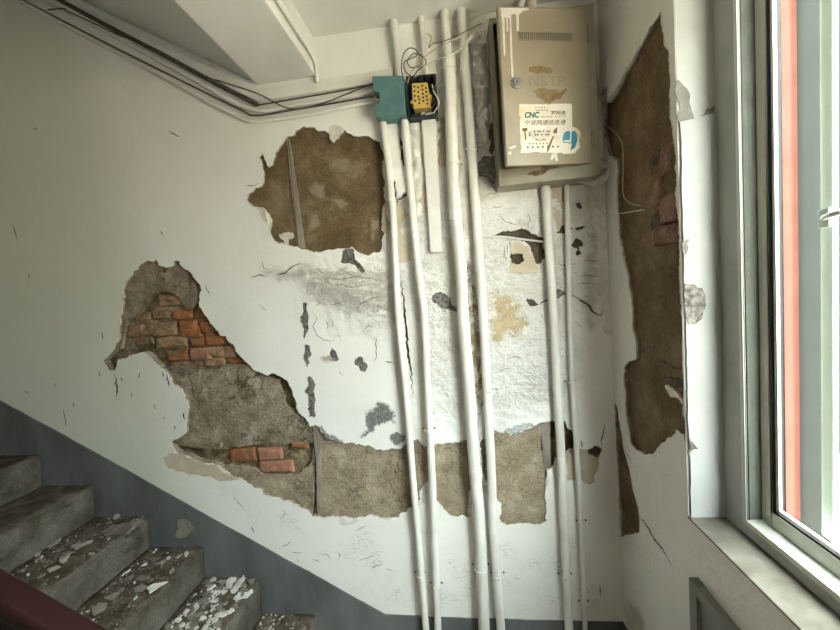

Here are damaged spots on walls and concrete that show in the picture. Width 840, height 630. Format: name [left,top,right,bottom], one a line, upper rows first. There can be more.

flaking render [110,260,472,526]
flaking render [246,123,426,273]
crack [312,266,414,396]
leakage [490,296,528,341]
peeling [494,229,545,274]
flaking render [598,11,715,537]
flaking render [480,420,602,526]
crack [638,513,671,564]